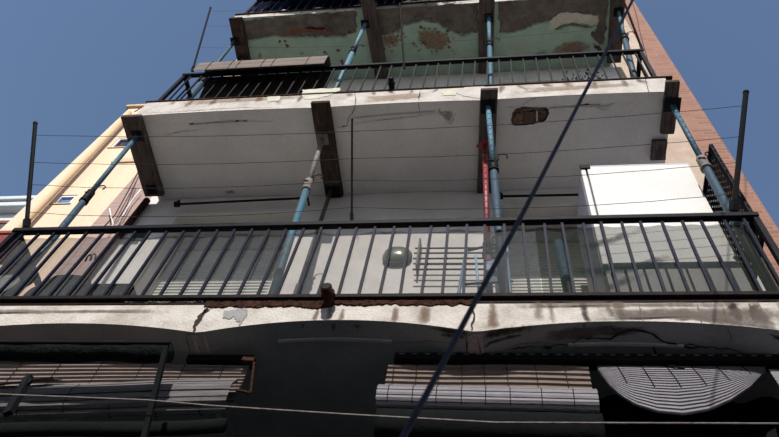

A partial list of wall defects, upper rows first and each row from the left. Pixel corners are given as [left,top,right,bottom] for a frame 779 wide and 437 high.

peeling [244,10,358,48]
peeling [498,0,609,44]
crack [337,88,427,128]
spalling [511,106,549,126]
crack [185,307,210,355]
peeling [223,308,247,326]
corrosion [125,299,473,330]
crack [396,311,481,354]
crack [505,303,743,354]